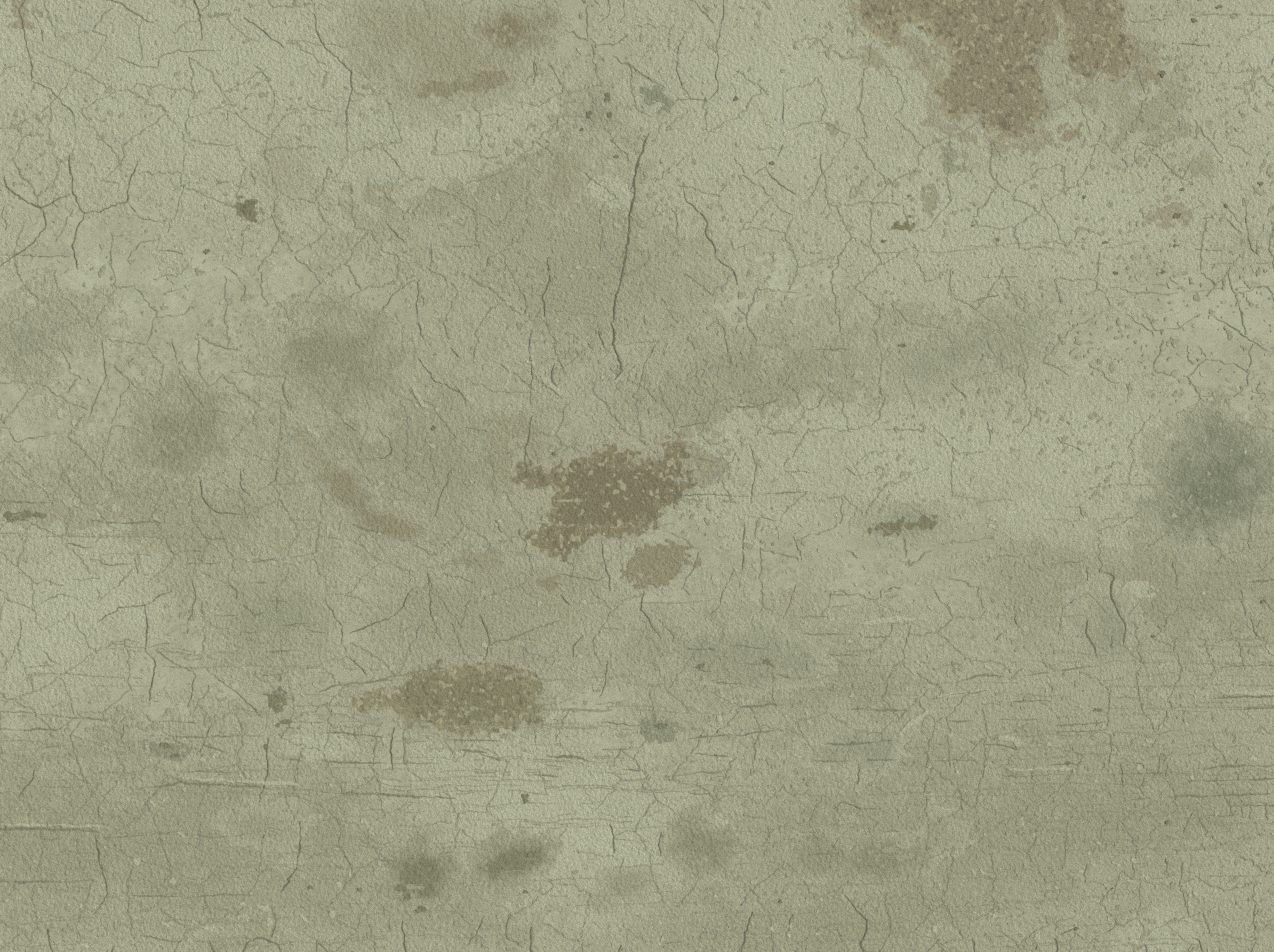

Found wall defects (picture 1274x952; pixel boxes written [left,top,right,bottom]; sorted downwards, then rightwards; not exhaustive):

spalling [838,0,1166,158]
crack [966,73,1102,251]
crack [1126,57,1191,179]
crack [1206,21,1274,88]
crack [731,37,1032,503]
crack [1043,241,1166,376]
crack [1128,202,1274,403]
crack [0,0,770,952]
spalling [504,427,734,589]
spalling [338,647,566,753]
crack [527,468,1210,952]
crack [1001,672,1274,952]